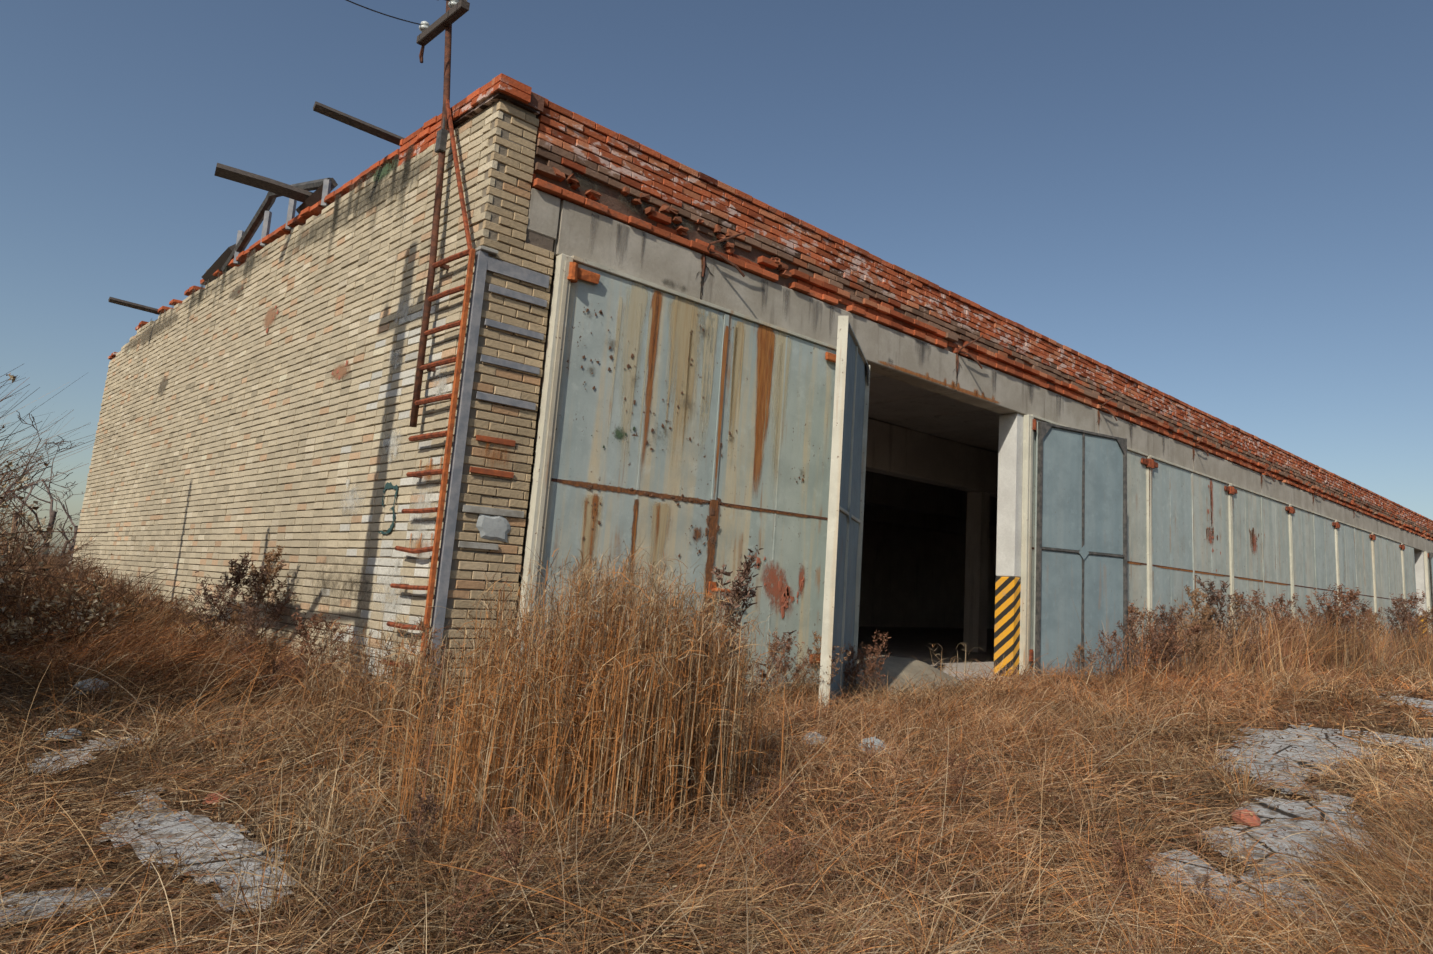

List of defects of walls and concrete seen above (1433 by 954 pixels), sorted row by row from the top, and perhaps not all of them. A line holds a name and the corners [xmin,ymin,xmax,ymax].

water stain [297,147,420,248]
spalling [552,167,602,200]
spalling [620,186,735,255]
corrosion [643,290,662,457]
corrosion [753,324,775,489]
corrosion [562,480,810,594]
corrosion [1127,479,1287,617]